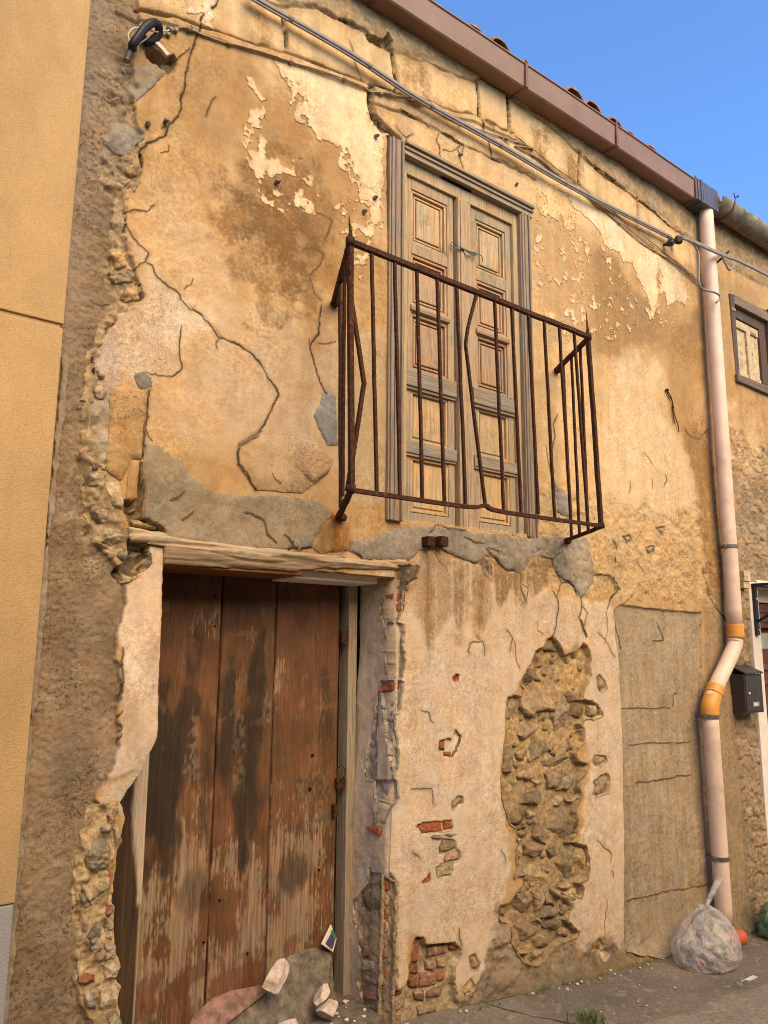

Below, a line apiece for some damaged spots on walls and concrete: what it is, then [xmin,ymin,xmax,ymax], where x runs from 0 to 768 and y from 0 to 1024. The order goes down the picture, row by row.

peeling [243,76,319,216]
peeling [274,57,384,280]
crack [122,0,362,558]
peeling [531,182,689,347]
crack [426,524,645,657]
spalling [71,799,122,1024]
spalling [352,869,481,1024]
spalling [416,795,464,883]
spalling [498,634,611,967]
crack [621,692,678,710]
crack [628,739,690,747]
crack [635,774,691,783]